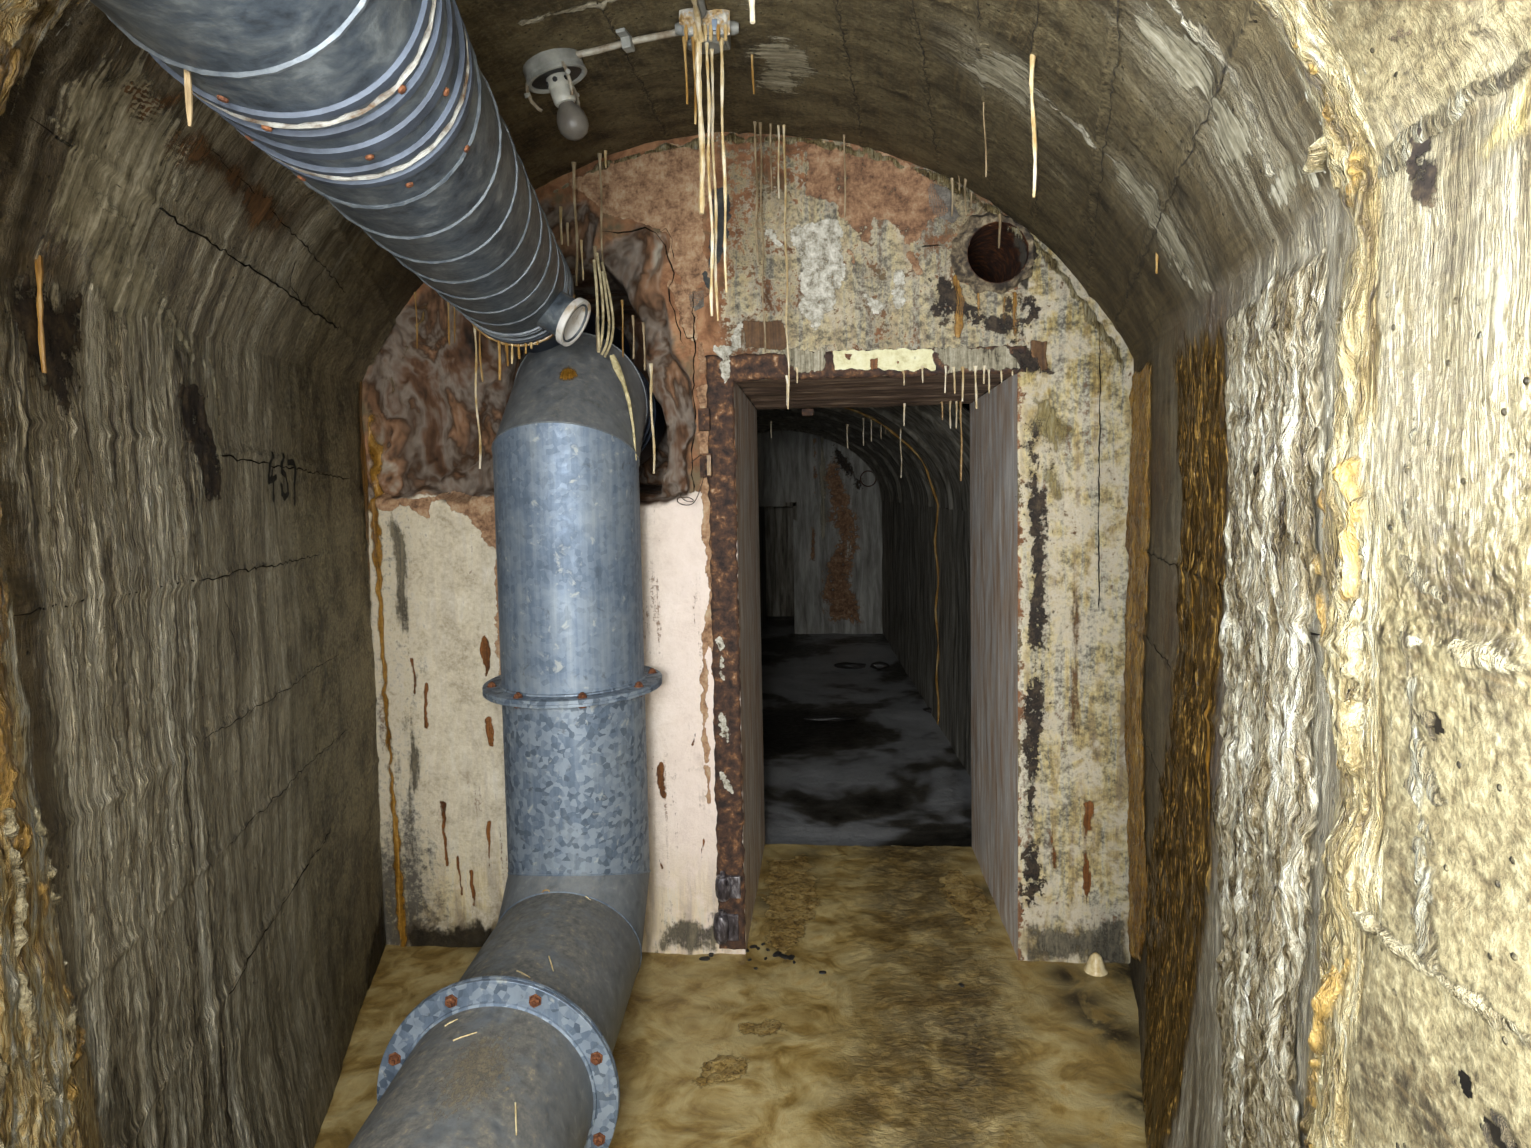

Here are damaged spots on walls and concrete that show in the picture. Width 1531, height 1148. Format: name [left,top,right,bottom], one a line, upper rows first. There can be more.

peeling [764,143,948,330]
rust [560,367,577,380]
peeling [731,321,743,351]
peeling [833,348,936,372]
rust [410,658,429,729]
rust [440,801,491,906]